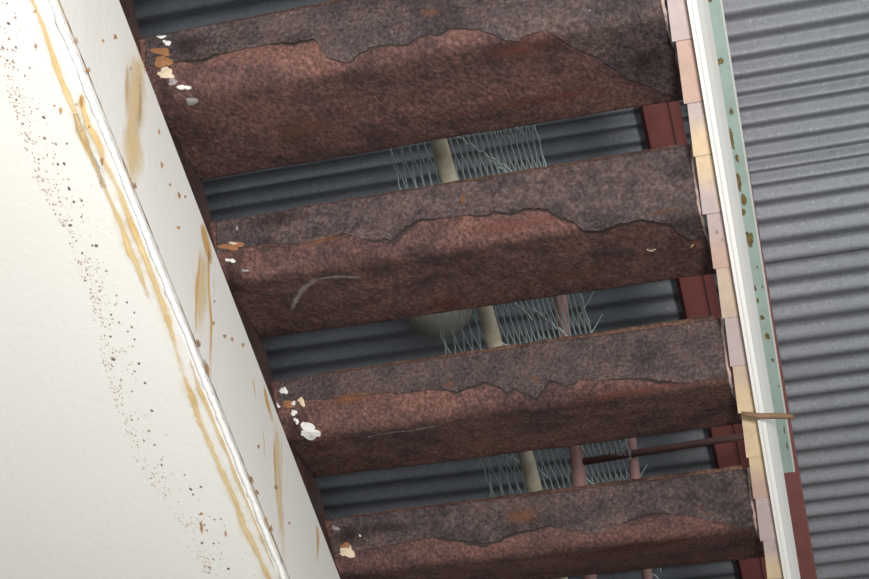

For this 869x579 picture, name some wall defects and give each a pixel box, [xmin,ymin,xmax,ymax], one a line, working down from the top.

peeling [150,35,199,106]
rust [32,0,174,341]
rust [736,174,747,216]
leakage [0,2,230,576]
rust [196,226,215,348]
peeling [277,387,321,440]
rust [186,381,275,579]
rust [274,439,290,527]
peeling [340,542,355,558]